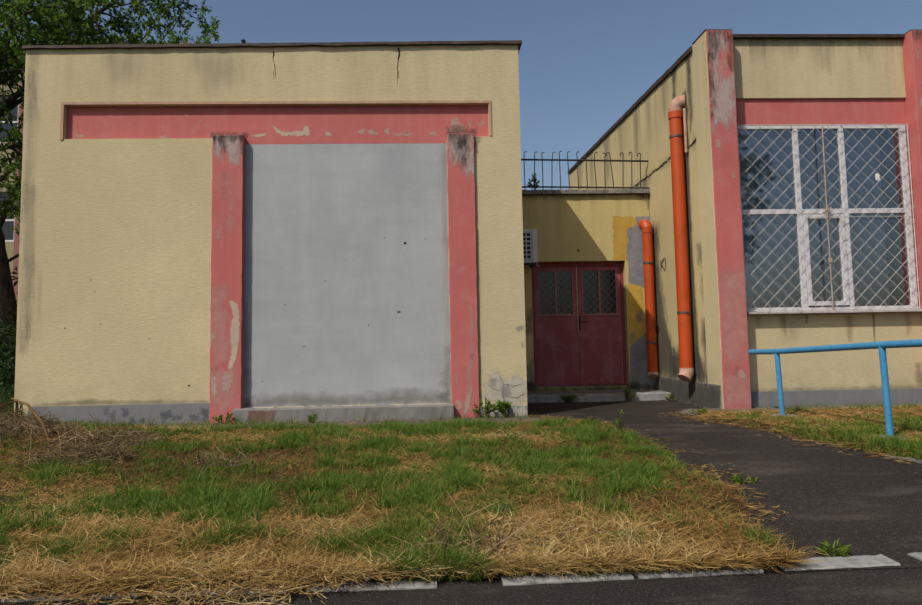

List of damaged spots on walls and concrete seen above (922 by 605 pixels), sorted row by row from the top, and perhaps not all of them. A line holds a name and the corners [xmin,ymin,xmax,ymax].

peeling [250,125,310,137]
peeling [210,301,240,396]